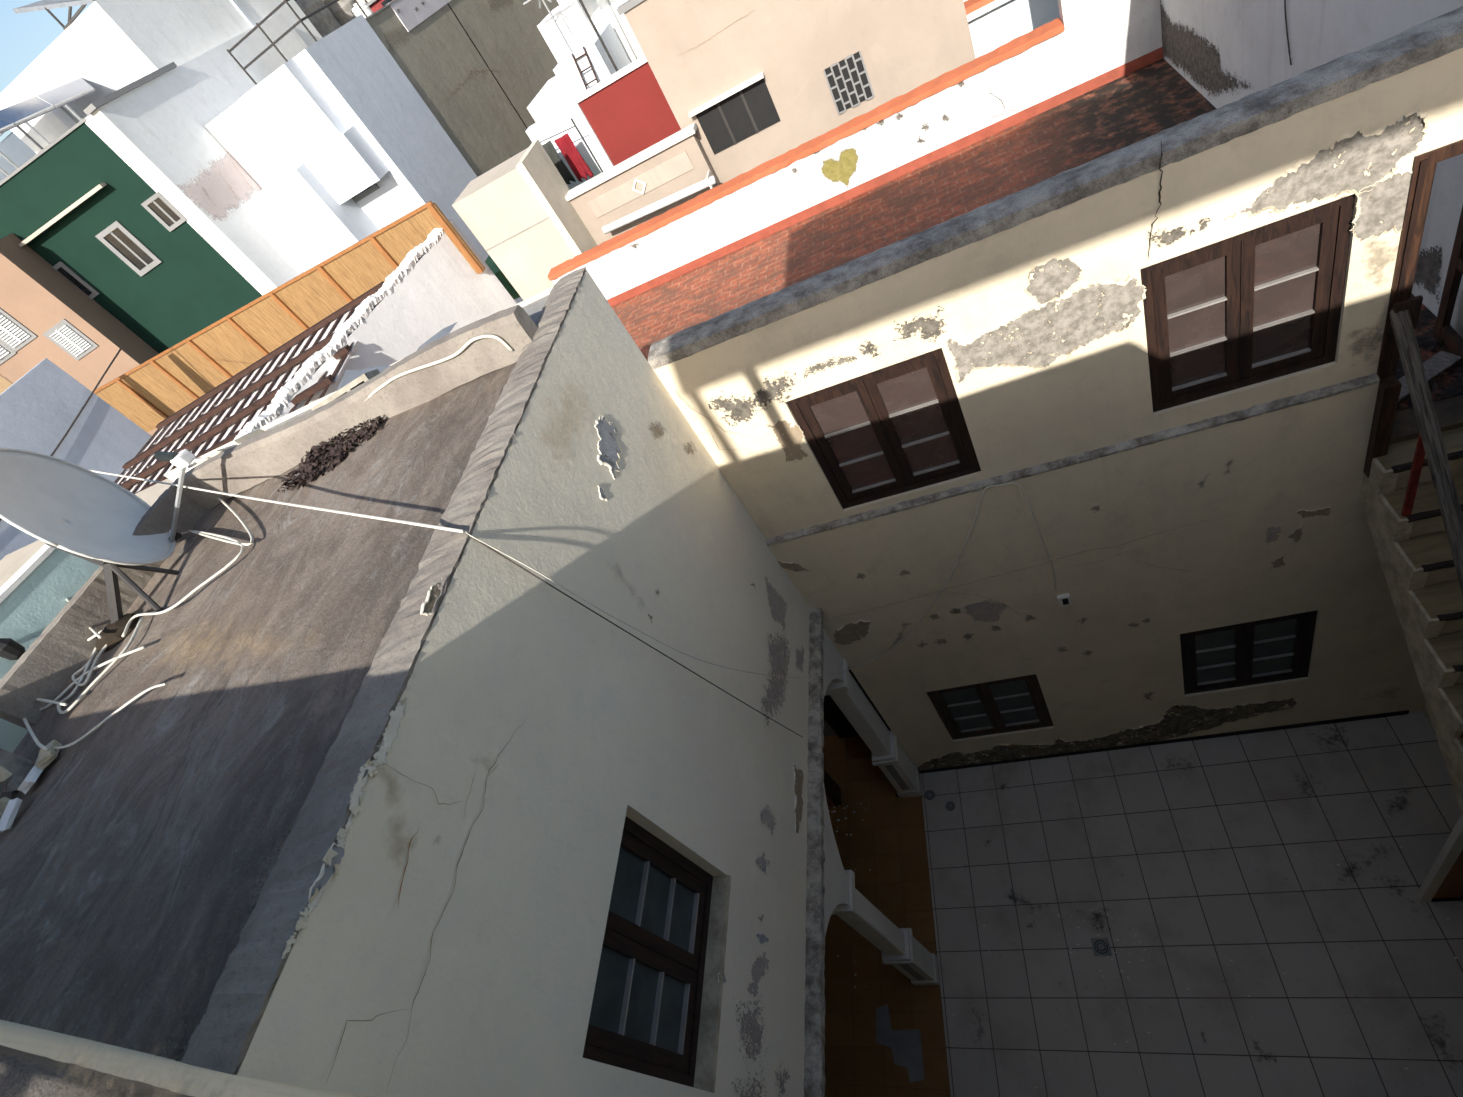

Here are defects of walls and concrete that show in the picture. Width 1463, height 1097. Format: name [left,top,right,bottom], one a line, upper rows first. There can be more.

peeling [1148,108,1429,247]
peeling [707,256,1146,462]
peeling [594,415,622,501]
peeling [282,697,408,959]
crack [326,716,528,1085]
peeling [751,575,804,727]
spalling [916,691,1298,783]
peeling [717,914,790,1097]